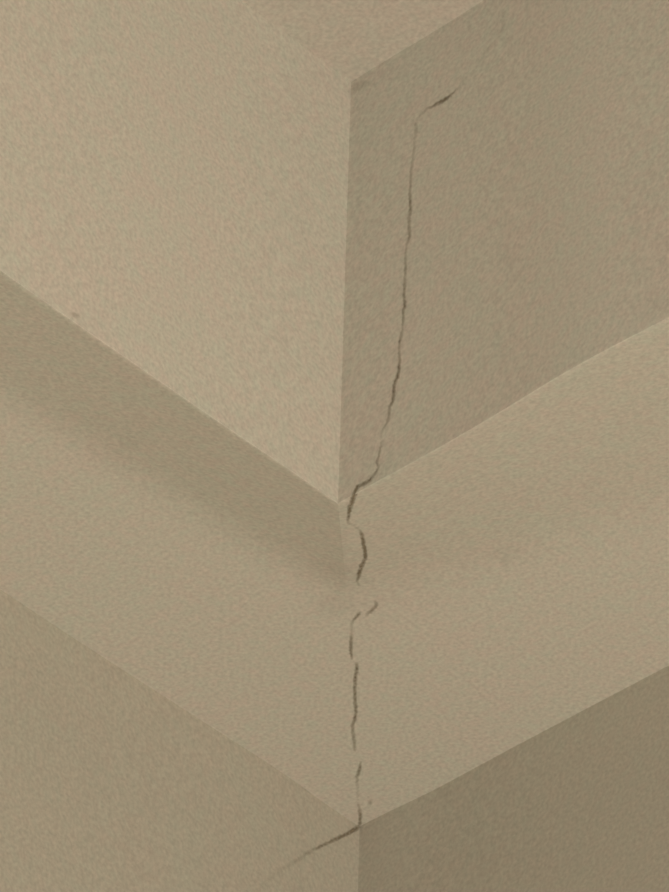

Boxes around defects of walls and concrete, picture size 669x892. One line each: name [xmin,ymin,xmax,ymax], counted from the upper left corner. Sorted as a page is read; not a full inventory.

crack [348,478,371,578]
crack [321,814,361,846]